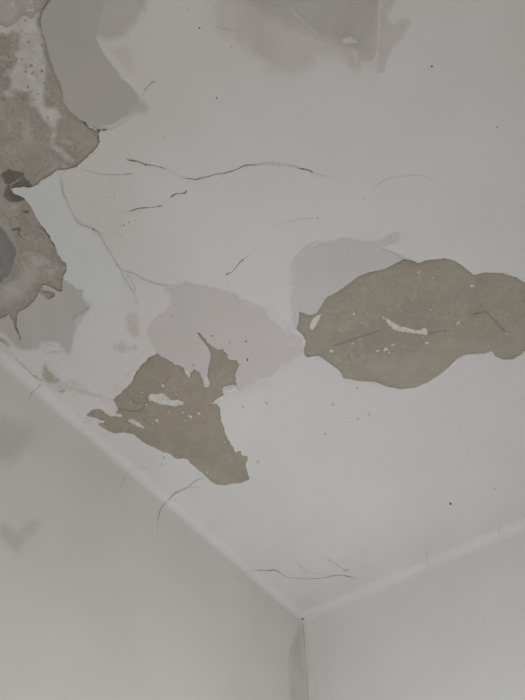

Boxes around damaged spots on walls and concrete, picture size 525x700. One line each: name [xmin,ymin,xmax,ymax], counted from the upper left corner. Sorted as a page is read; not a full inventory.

spalling [0,0,107,339]
crack [61,181,169,306]
crack [84,158,330,227]
spalling [297,258,525,389]
spalling [87,333,249,485]
crack [157,478,203,539]
crack [235,559,382,580]